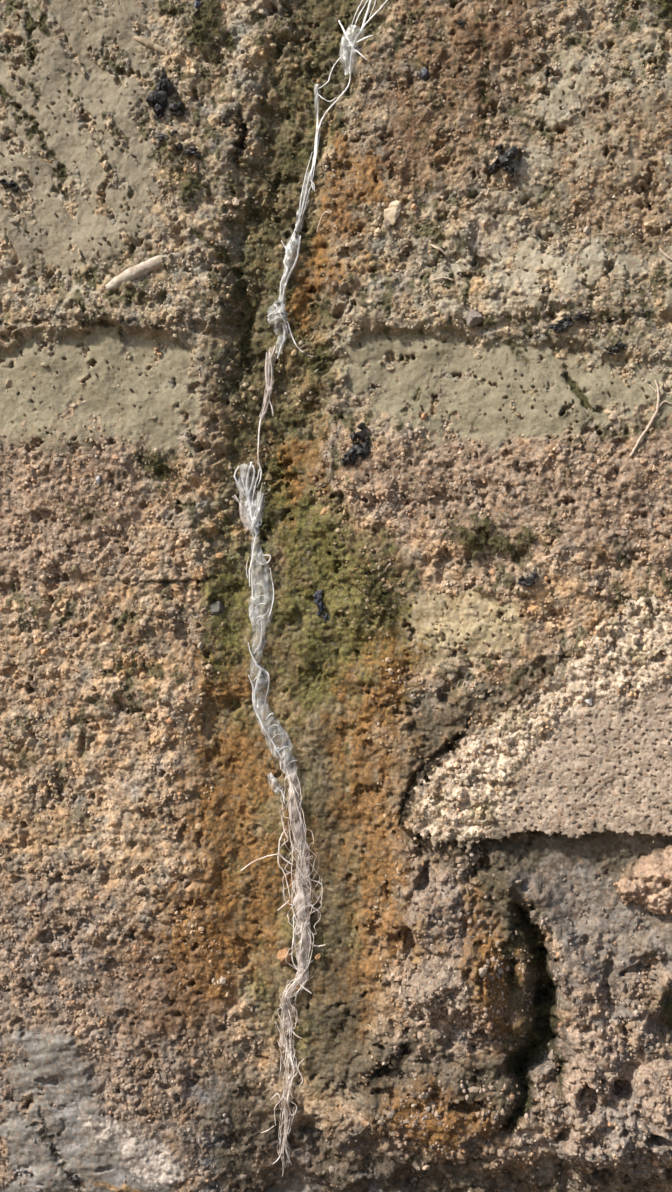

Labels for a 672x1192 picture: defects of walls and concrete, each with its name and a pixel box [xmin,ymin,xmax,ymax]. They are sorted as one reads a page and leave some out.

rust [417,0,523,140]
rust [278,88,443,330]
water stain [265,453,316,533]
rust [266,439,327,503]
water stain [200,556,263,684]
rust [119,630,423,1060]
water stain [305,882,525,1116]
water stain [200,1070,280,1192]
water stain [321,1139,496,1192]